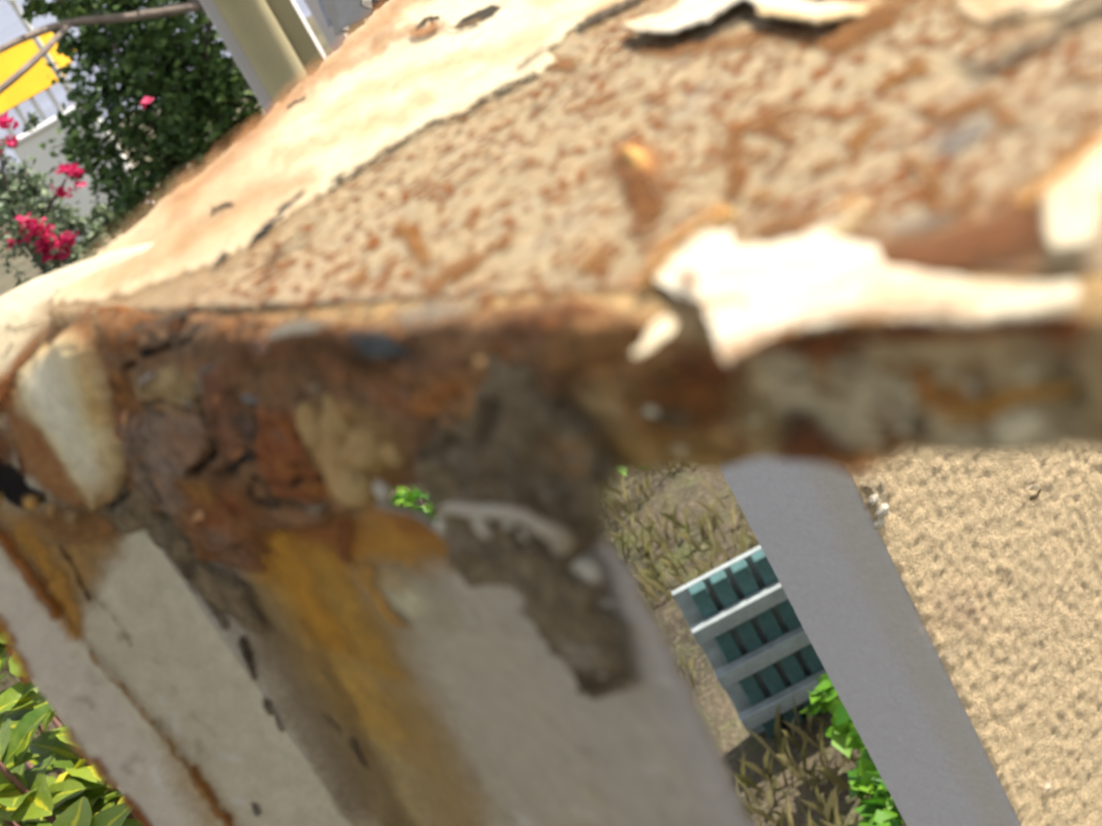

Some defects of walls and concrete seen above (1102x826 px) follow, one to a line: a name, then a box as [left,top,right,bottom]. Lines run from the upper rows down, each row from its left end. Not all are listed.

peeling [959,30,1060,70]
peeling [955,0,1070,25]
peeling [51,0,885,309]
corrosion [181,0,1102,322]
peeling [640,133,1102,365]
peeling [631,316,676,357]
corrosion [259,507,450,677]
peeling [568,554,609,608]